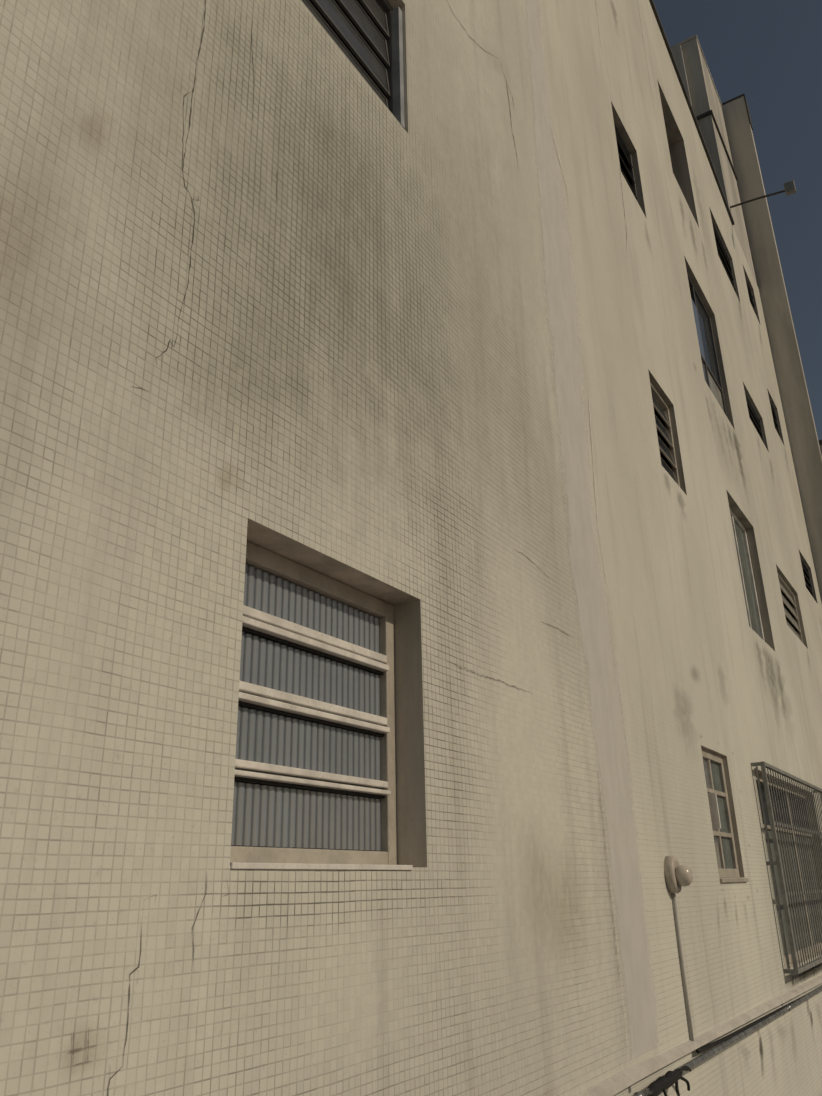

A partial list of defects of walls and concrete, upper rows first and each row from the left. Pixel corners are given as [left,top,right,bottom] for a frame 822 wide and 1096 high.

crack [156,0,206,362]
crack [107,894,157,1096]